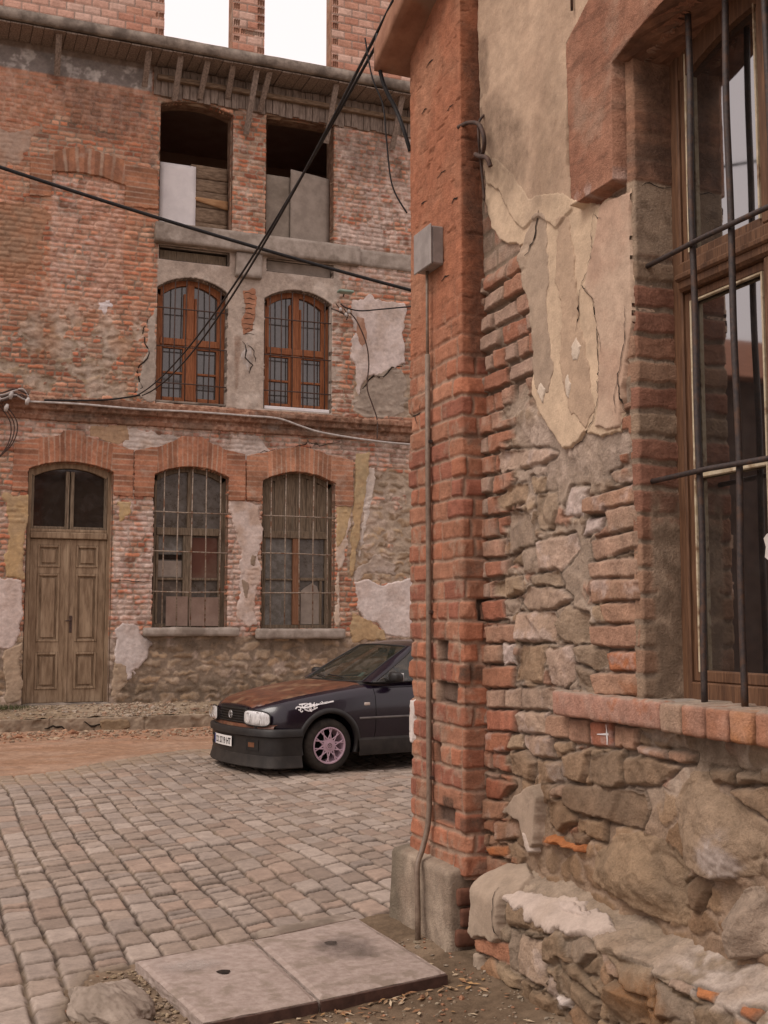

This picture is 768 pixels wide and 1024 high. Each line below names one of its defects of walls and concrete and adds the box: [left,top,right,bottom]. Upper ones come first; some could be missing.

peeling [477,0,655,449]
peeling [350,294,408,419]
crack [573,213,627,448]
peeling [0,492,29,704]
peeling [111,623,152,697]
peeling [229,501,263,627]
peeling [331,452,412,643]
spalling [455,783,617,970]